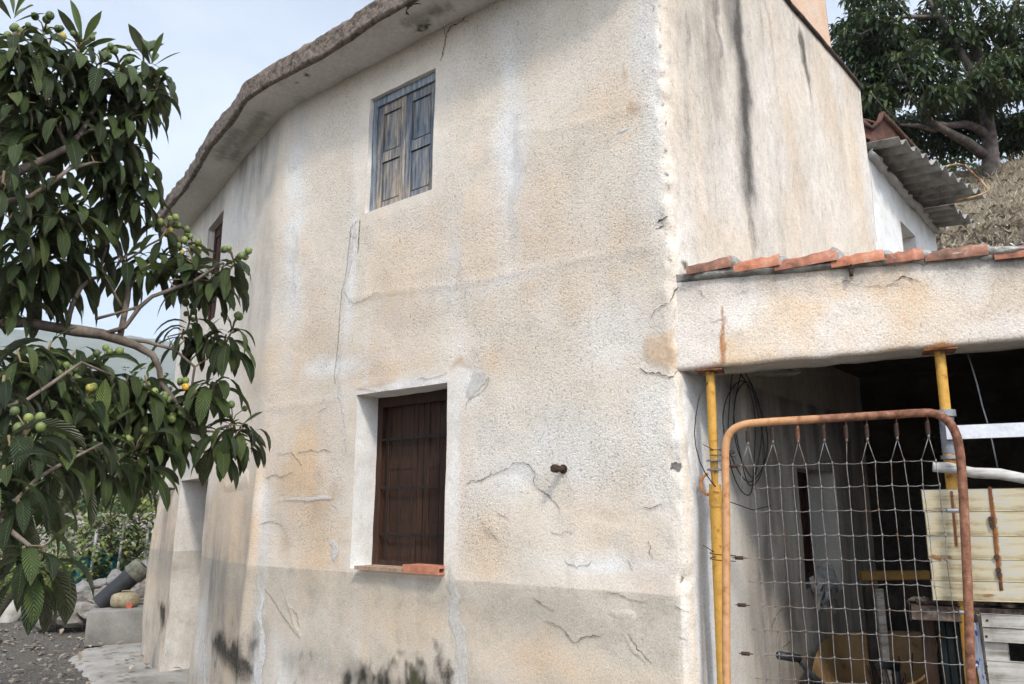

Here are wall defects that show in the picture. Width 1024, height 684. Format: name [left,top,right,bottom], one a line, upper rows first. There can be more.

damp [799,30,809,77]
damp [730,0,751,191]
crack [334,222,388,392]
peeling [646,333,677,366]
crack [467,462,568,534]
crack [533,597,602,643]
damp [213,633,253,680]